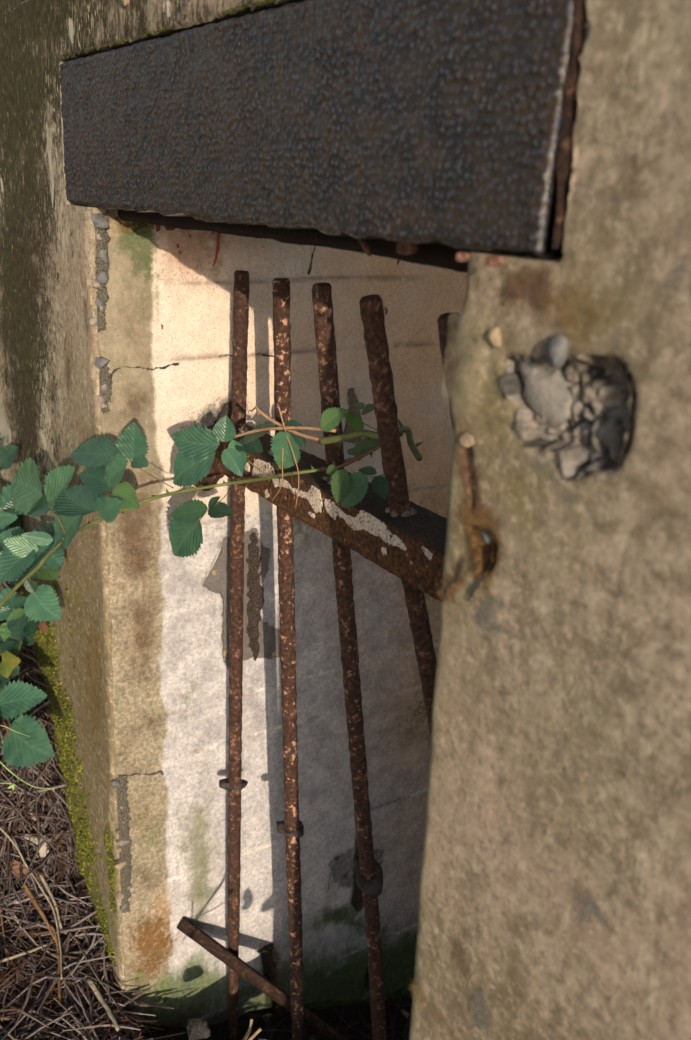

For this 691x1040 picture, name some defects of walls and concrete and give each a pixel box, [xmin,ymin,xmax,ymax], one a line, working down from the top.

leakage [46,121,55,211]
leakage [0,404,12,446]
spalling [500,333,637,482]
rust [456,433,479,514]
spalling [202,537,230,668]
spalling [243,528,281,661]
spalling [327,845,363,912]